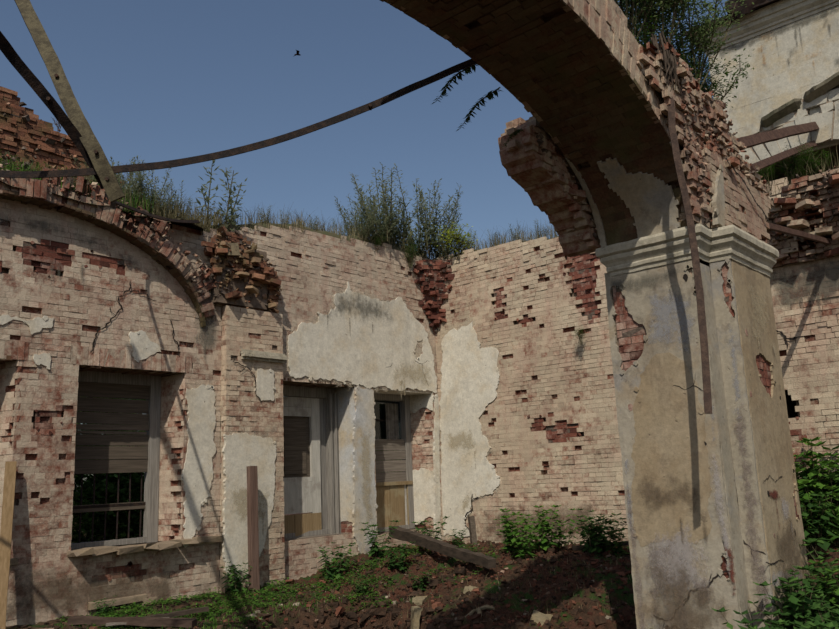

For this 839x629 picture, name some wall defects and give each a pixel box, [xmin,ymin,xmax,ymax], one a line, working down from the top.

flaking render [597,157,681,238]
flaking render [711,164,725,227]
spalling [563,157,607,324]
flaking render [0,315,54,335]
crack [91,281,156,352]
spalling [717,258,735,317]
spalling [756,354,781,400]
flaking render [287,281,501,554]
peeling [612,285,712,547]
flaking render [180,384,276,580]
crack [743,540,784,565]
crack [682,570,729,607]